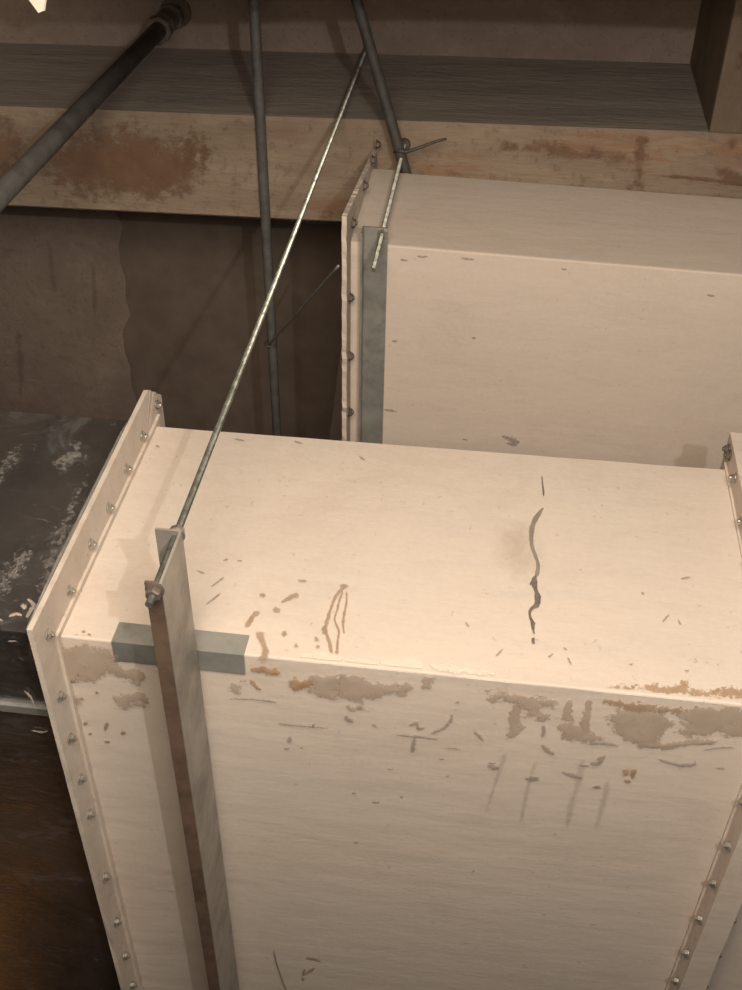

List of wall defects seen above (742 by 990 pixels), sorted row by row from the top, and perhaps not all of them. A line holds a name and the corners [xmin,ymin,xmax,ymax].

crack [528,477,544,644]
peeling [300,651,495,712]
peeling [486,689,602,743]
peeling [608,706,742,750]